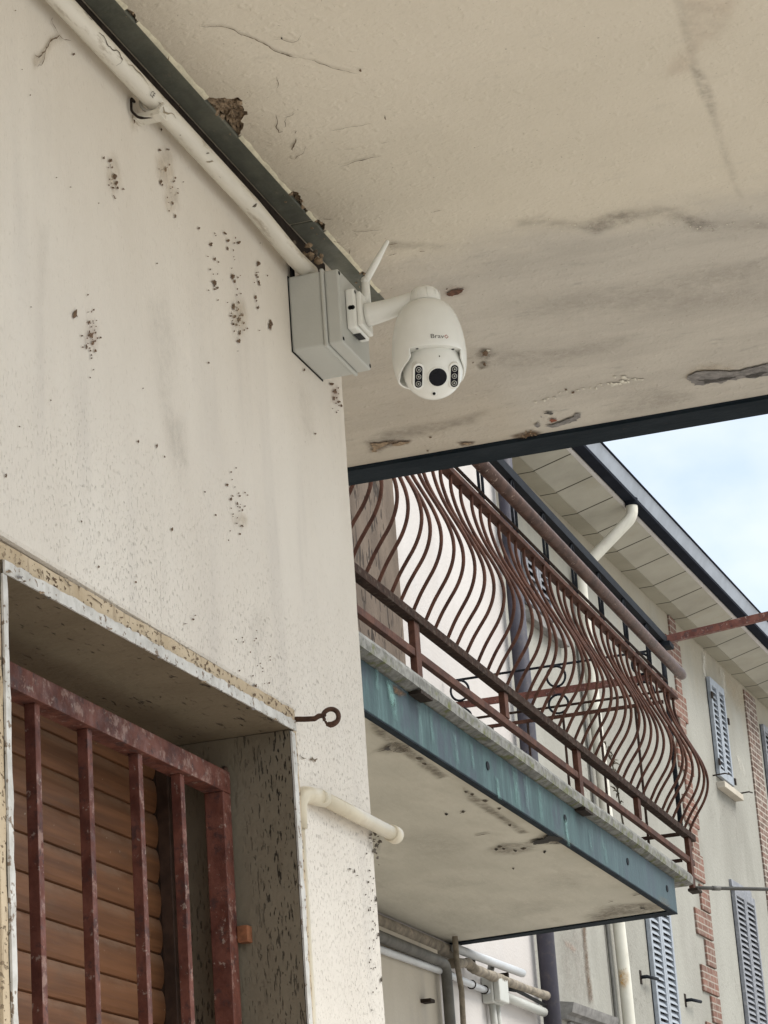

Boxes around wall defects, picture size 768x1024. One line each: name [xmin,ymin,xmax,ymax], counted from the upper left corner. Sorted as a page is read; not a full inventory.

crack [37,22,71,66]
crack [202,26,361,73]
spalling [687,364,768,386]
peeling [534,376,644,428]